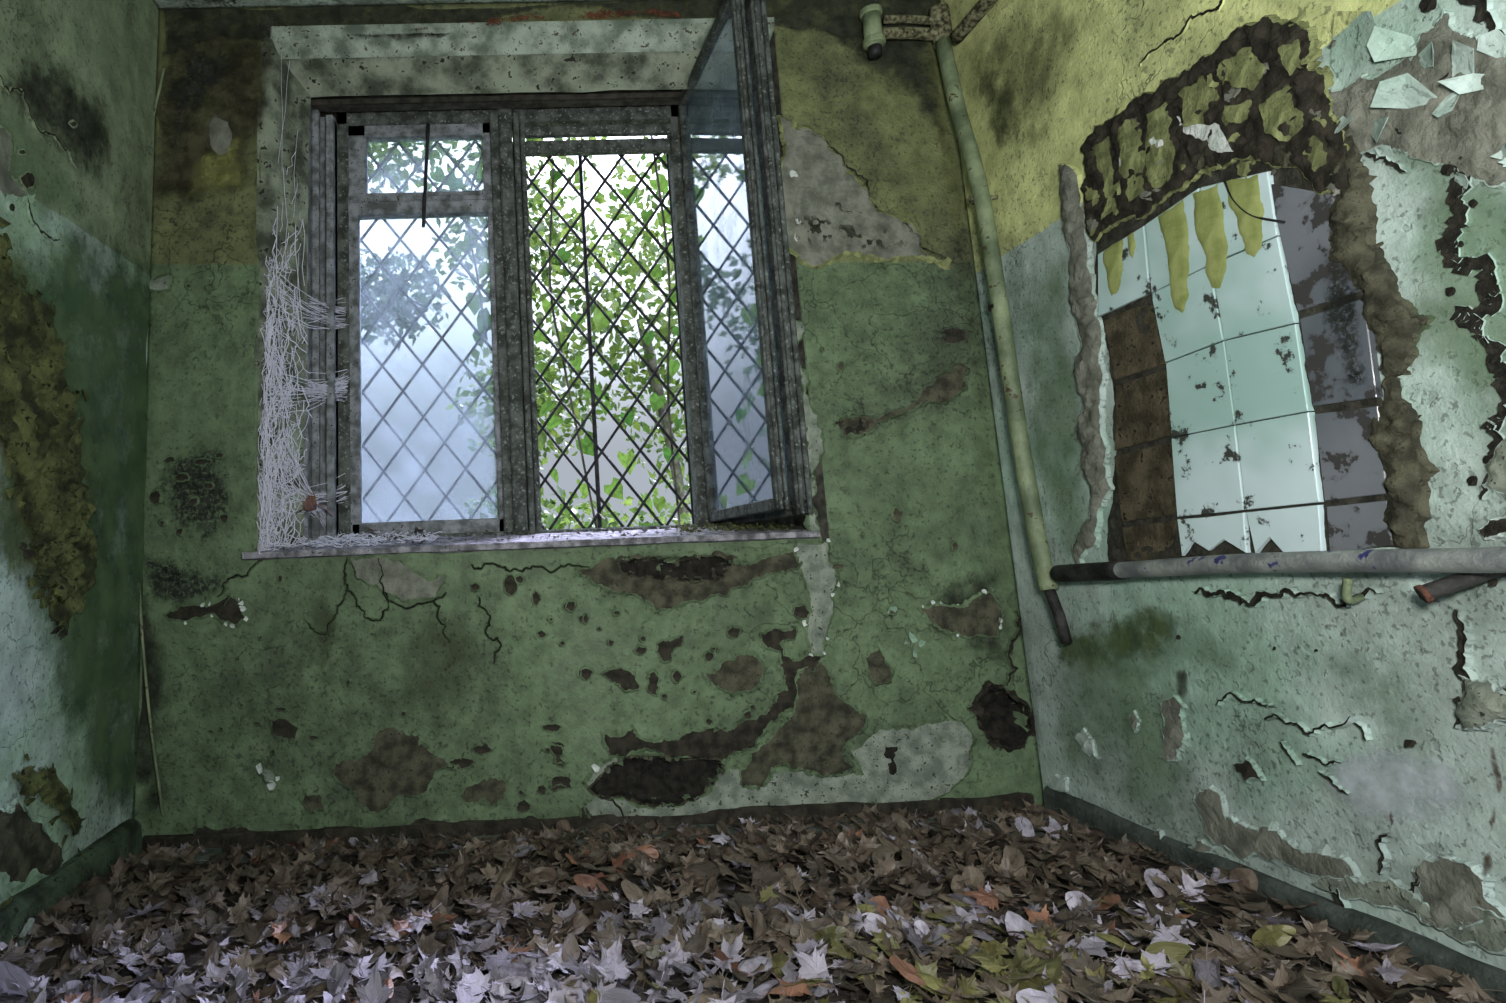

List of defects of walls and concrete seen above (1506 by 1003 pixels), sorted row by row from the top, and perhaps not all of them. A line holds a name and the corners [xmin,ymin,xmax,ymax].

peeling [776,115,954,270]
leakage [162,451,229,538]
crack [306,558,590,665]
flaking render [573,326,1004,819]
spalling [1455,673,1506,733]
peeling [1232,756,1267,785]
flaking render [0,794,65,890]
peeling [1184,785,1506,956]